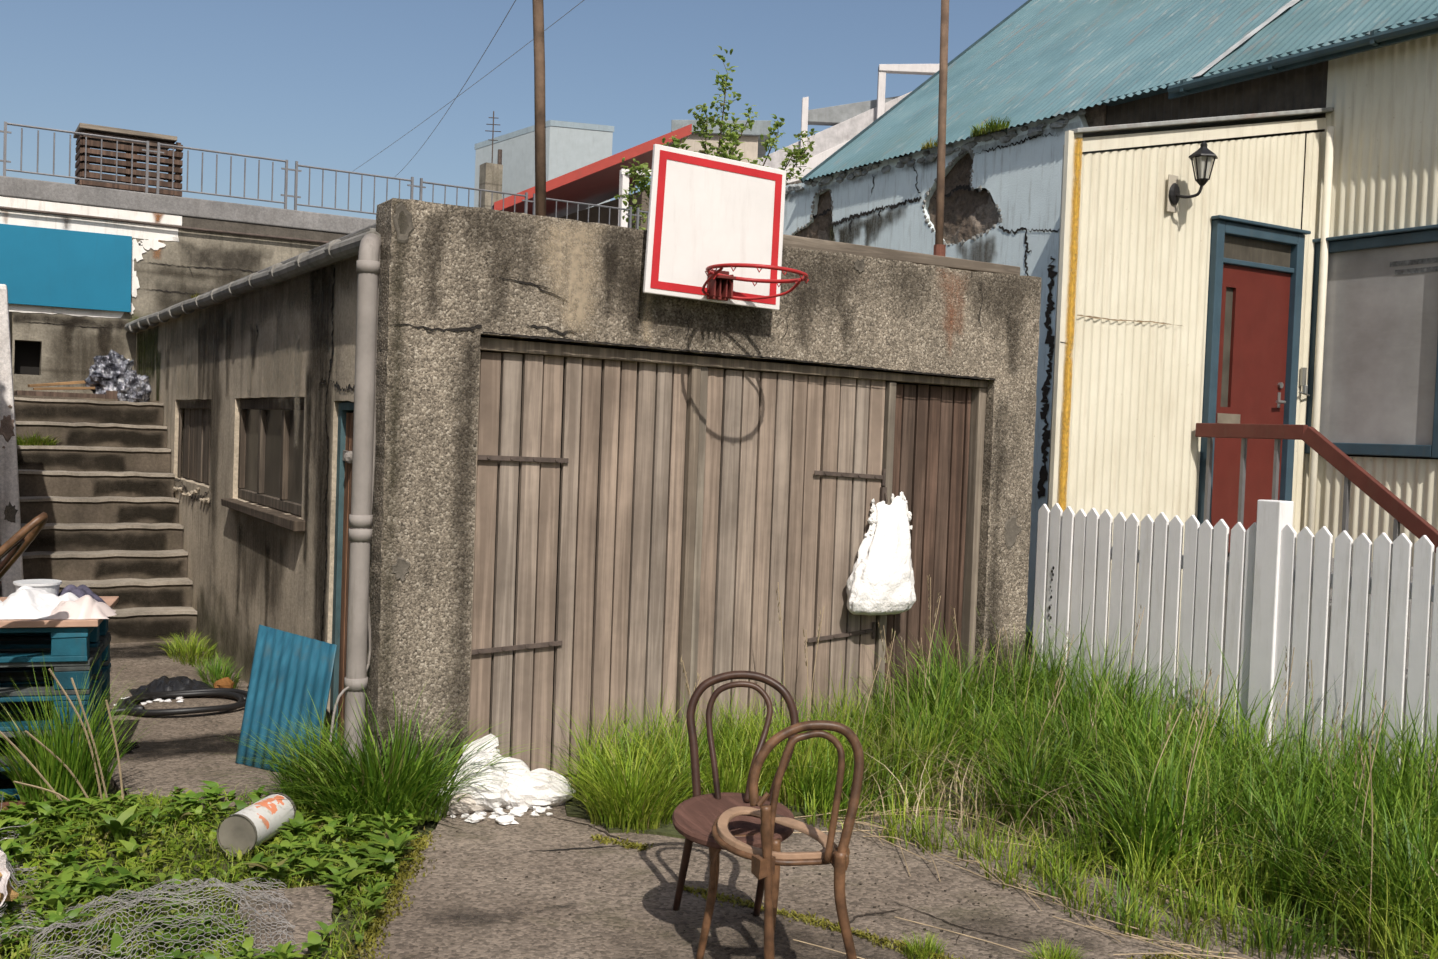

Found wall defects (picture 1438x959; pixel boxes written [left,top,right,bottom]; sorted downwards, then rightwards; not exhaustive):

spalling [792,188,836,241]
crack [831,167,921,241]
spalling [922,148,1002,246]
peeling [130,239,166,315]
water stain [158,246,259,310]
water stain [551,229,593,322]
water stain [13,315,125,380]
water stain [247,267,332,641]
water stain [15,405,254,667]